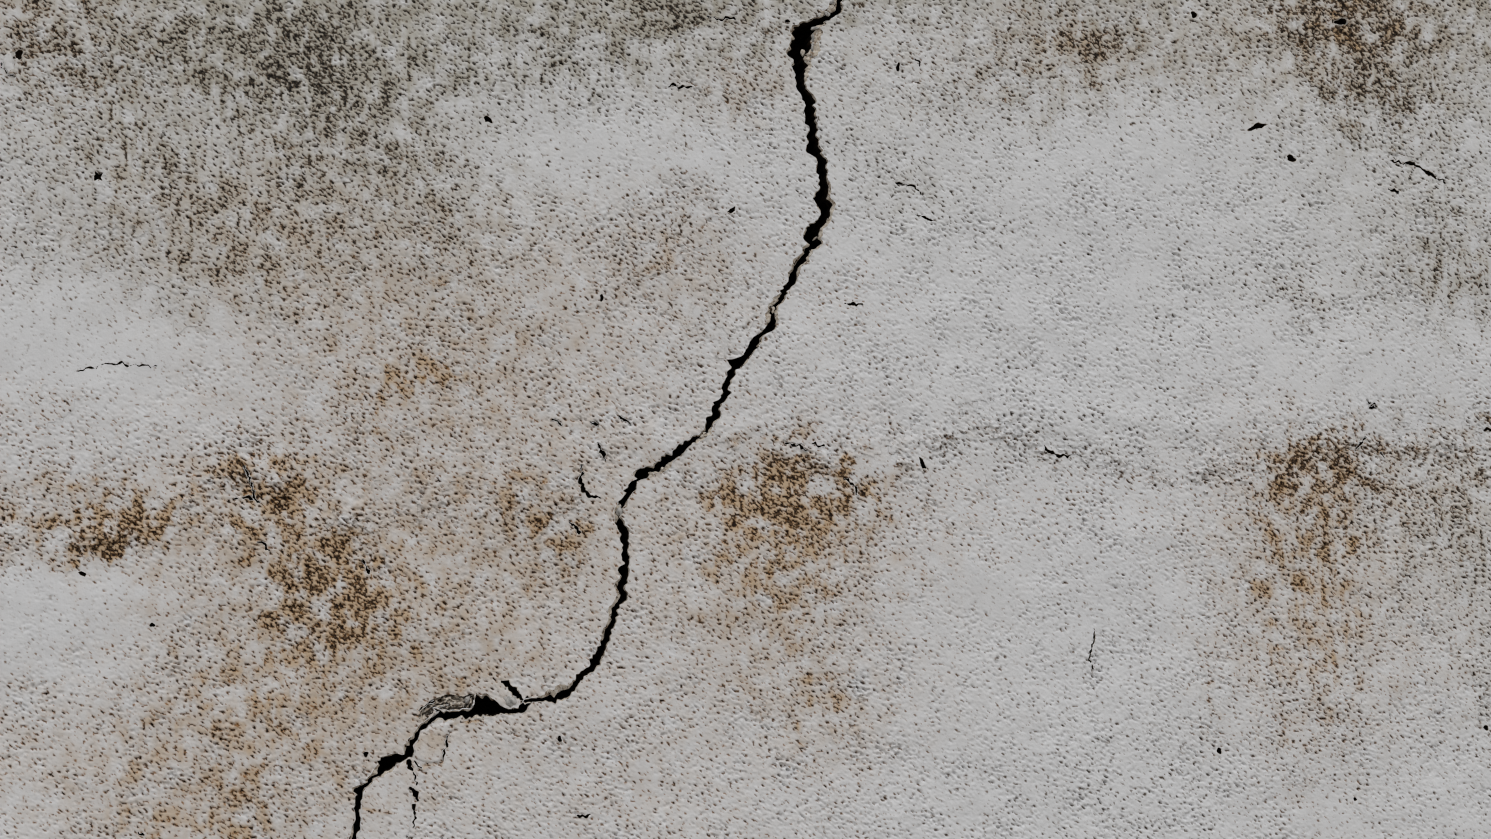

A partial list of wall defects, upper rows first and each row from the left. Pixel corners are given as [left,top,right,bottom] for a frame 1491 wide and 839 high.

crack [844,300,863,308]
crack [348,0,844,839]
crack [844,478,860,497]